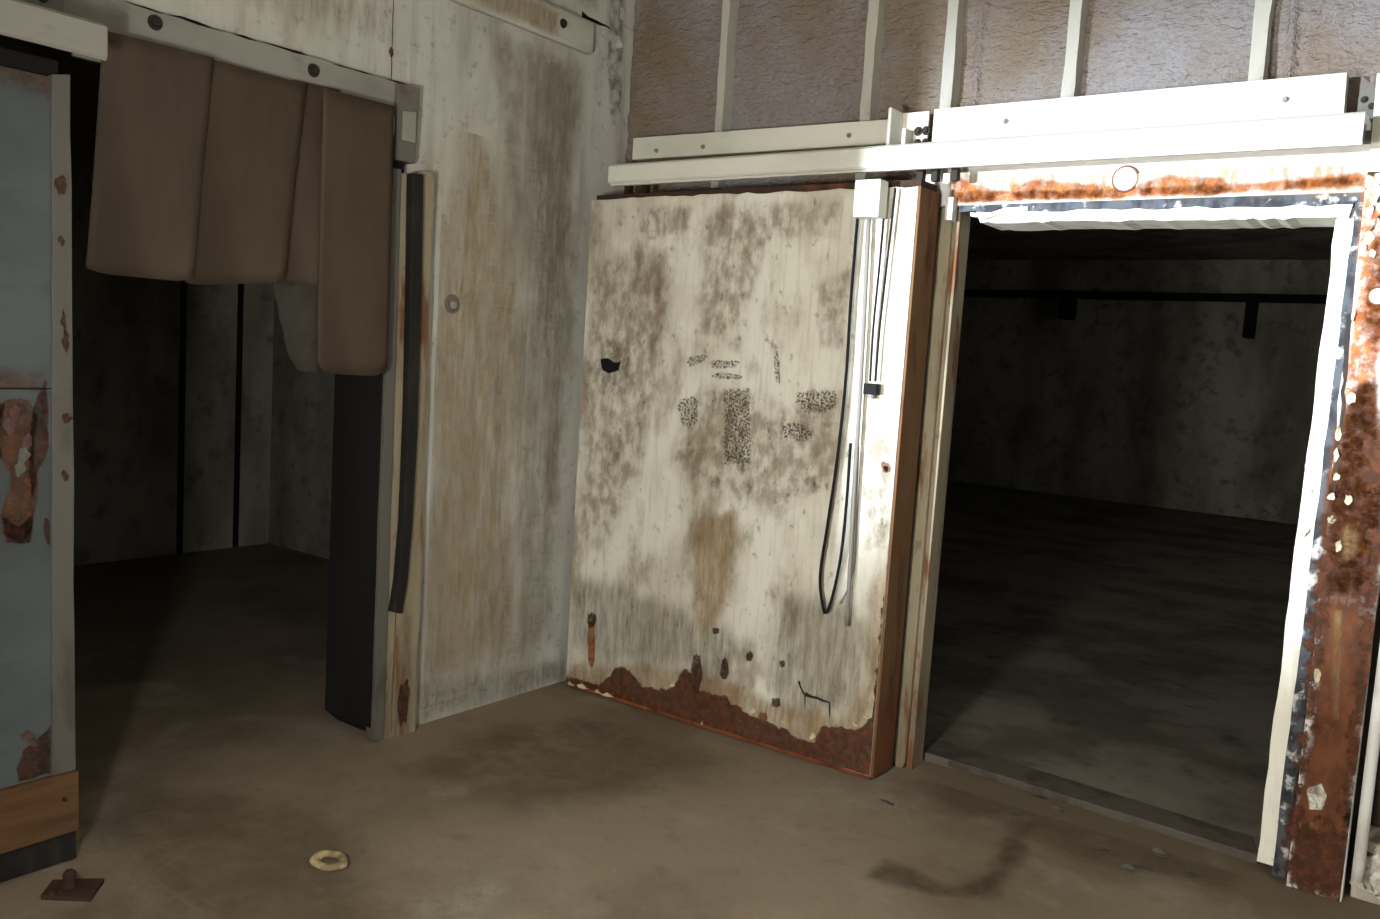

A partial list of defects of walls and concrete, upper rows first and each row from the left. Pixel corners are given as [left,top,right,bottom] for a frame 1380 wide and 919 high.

rust [0,399,50,545]
damp [432,155,514,667]
rust [566,598,884,776]
rust [951,166,1380,902]